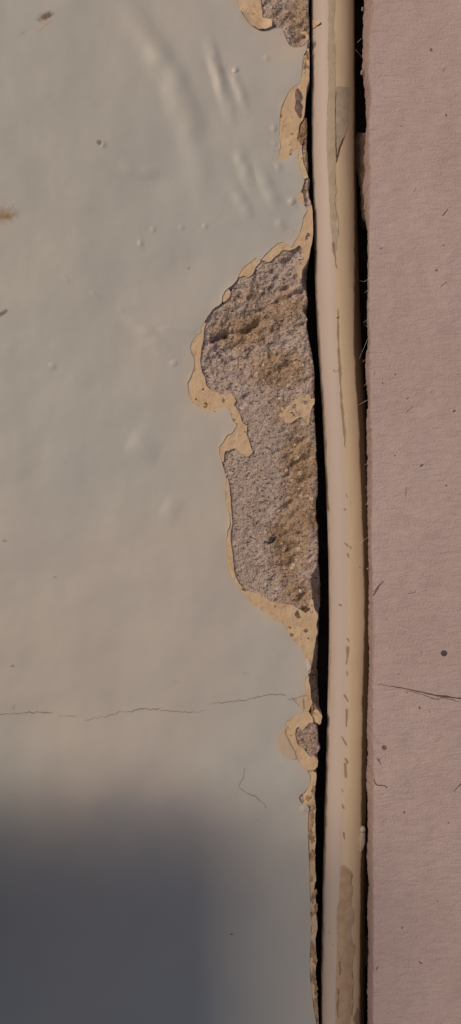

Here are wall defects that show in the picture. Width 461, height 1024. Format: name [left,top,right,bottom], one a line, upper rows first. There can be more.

spalling [188,0,350,1024]